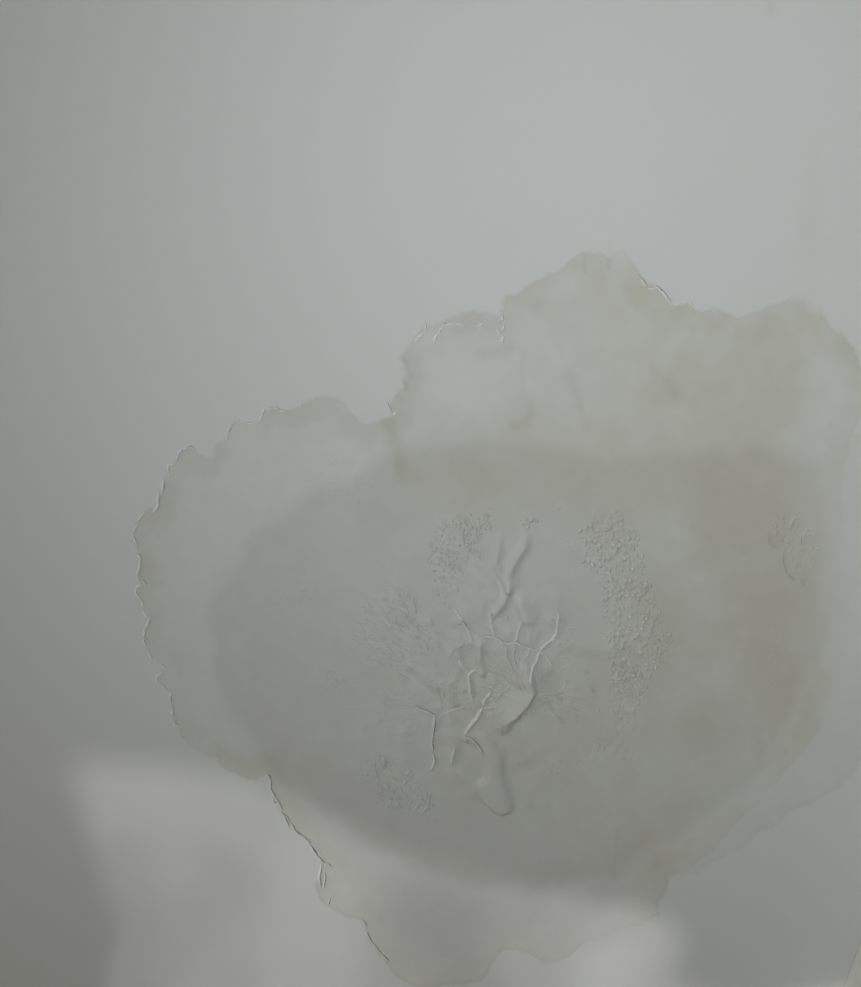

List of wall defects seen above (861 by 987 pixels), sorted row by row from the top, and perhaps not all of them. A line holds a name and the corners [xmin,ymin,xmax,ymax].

leakage [130,89,861,987]
crack [475,612,559,686]
crack [416,659,498,772]